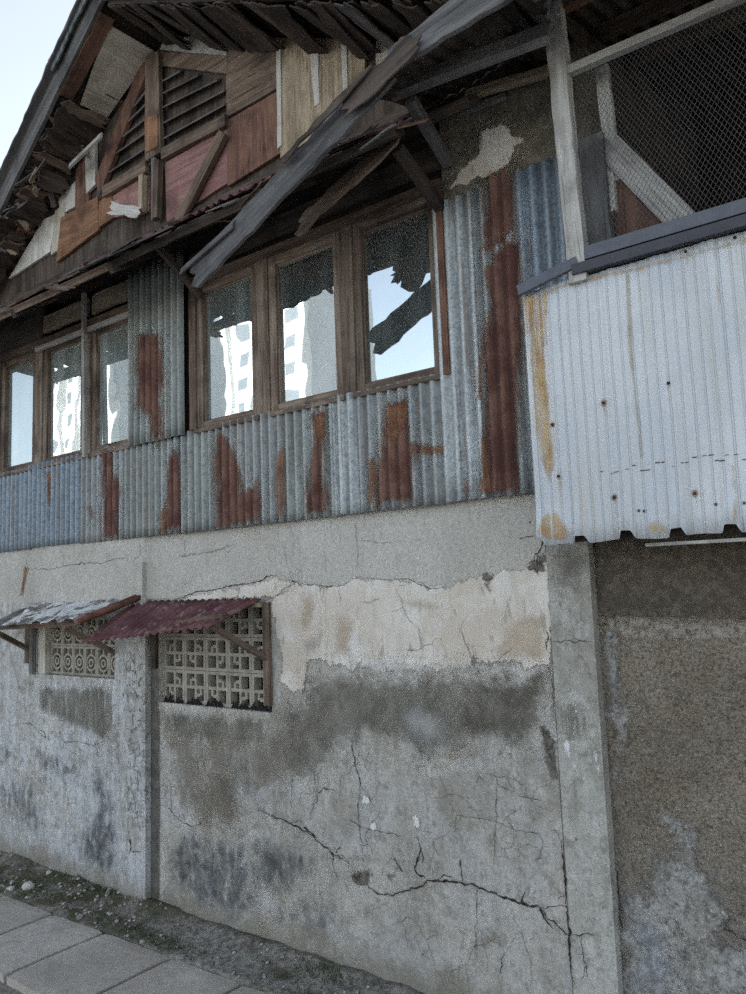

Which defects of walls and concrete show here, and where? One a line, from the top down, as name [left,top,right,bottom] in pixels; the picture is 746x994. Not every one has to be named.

peeling [448,123,525,190]
corrosion [134,333,164,437]
corrosion [478,171,560,495]
corrosion [101,449,119,538]
corrosion [368,399,443,506]
crack [182,514,513,702]
peeling [177,554,552,693]
water stain [41,688,112,735]
water stain [84,778,114,868]
water stain [175,842,252,911]
crack [31,653,591,994]
water stain [151,668,538,900]